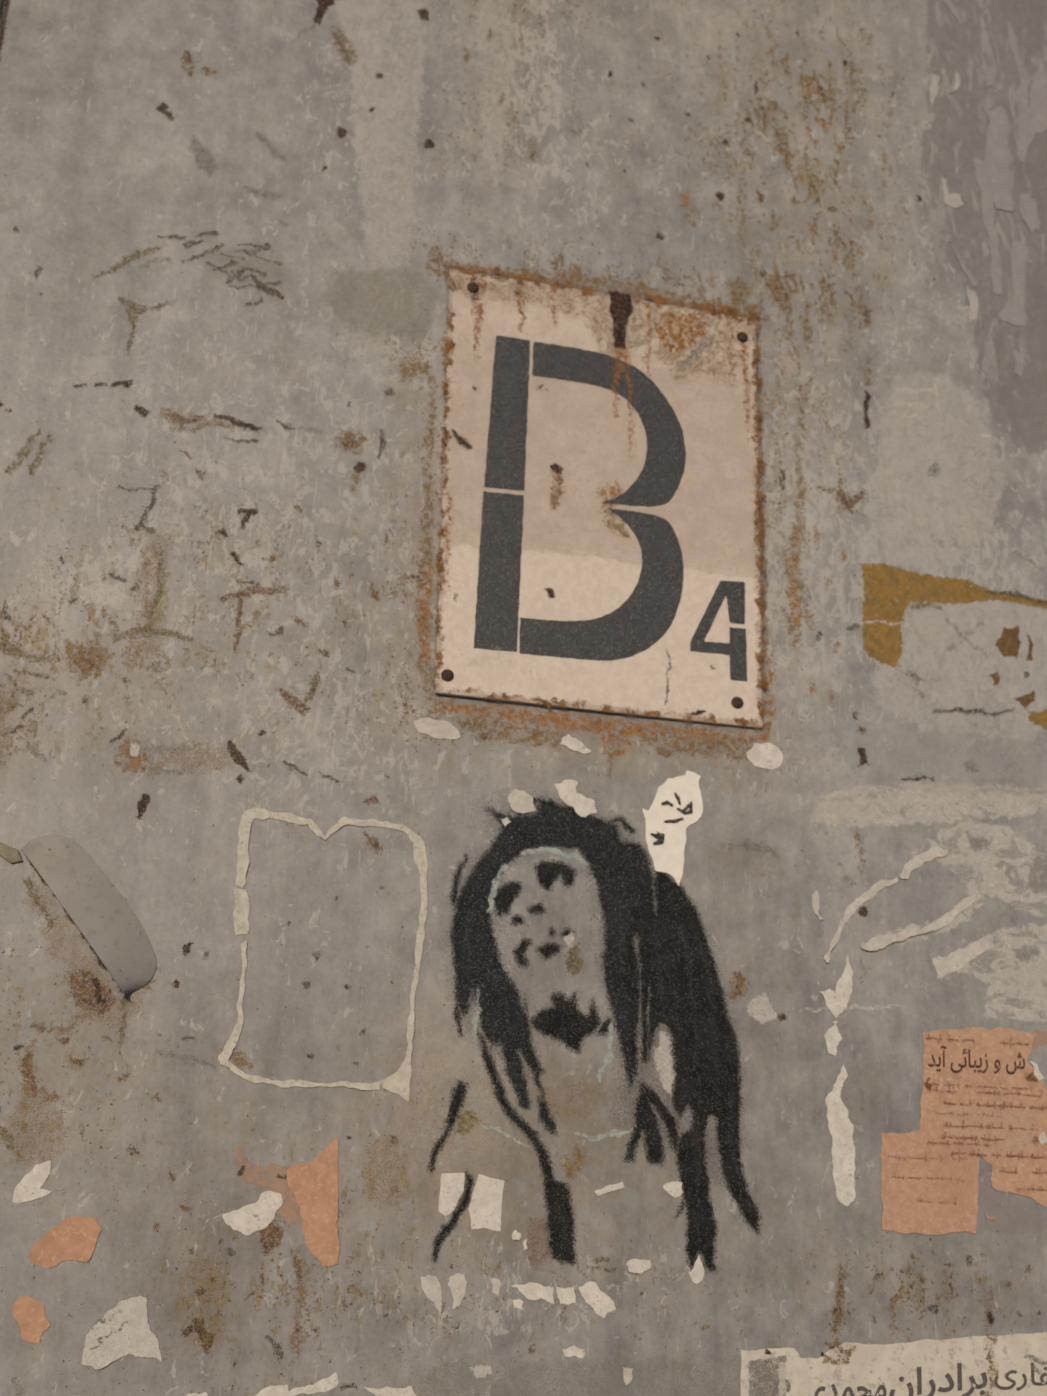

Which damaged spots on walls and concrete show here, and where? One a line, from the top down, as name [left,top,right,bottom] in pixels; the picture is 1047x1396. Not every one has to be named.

corrosion [292,0,359,66]
corrosion [425,240,770,323]
corrosion [862,356,874,429]
corrosion [383,355,867,778]
corrosion [0,872,160,1169]